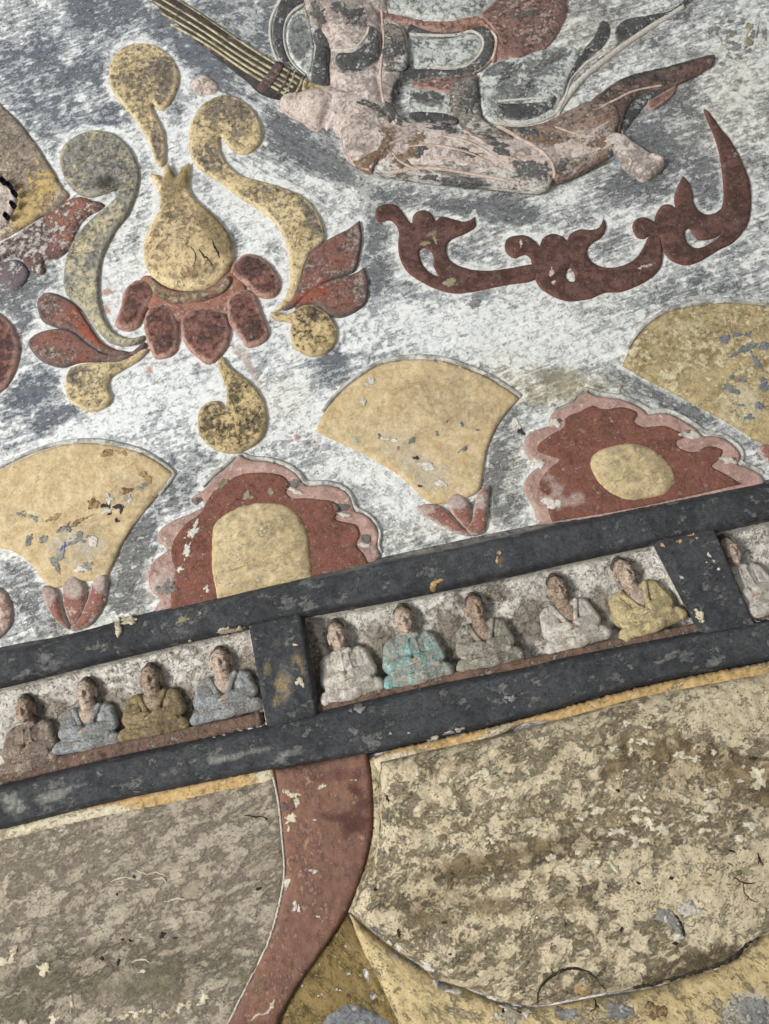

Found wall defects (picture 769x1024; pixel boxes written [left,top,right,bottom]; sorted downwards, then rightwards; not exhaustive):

peeling [719,331,769,420]
peeling [99,449,128,457]
peeling [15,470,152,575]
peeling [151,518,200,596]
crack [501,967,606,1016]